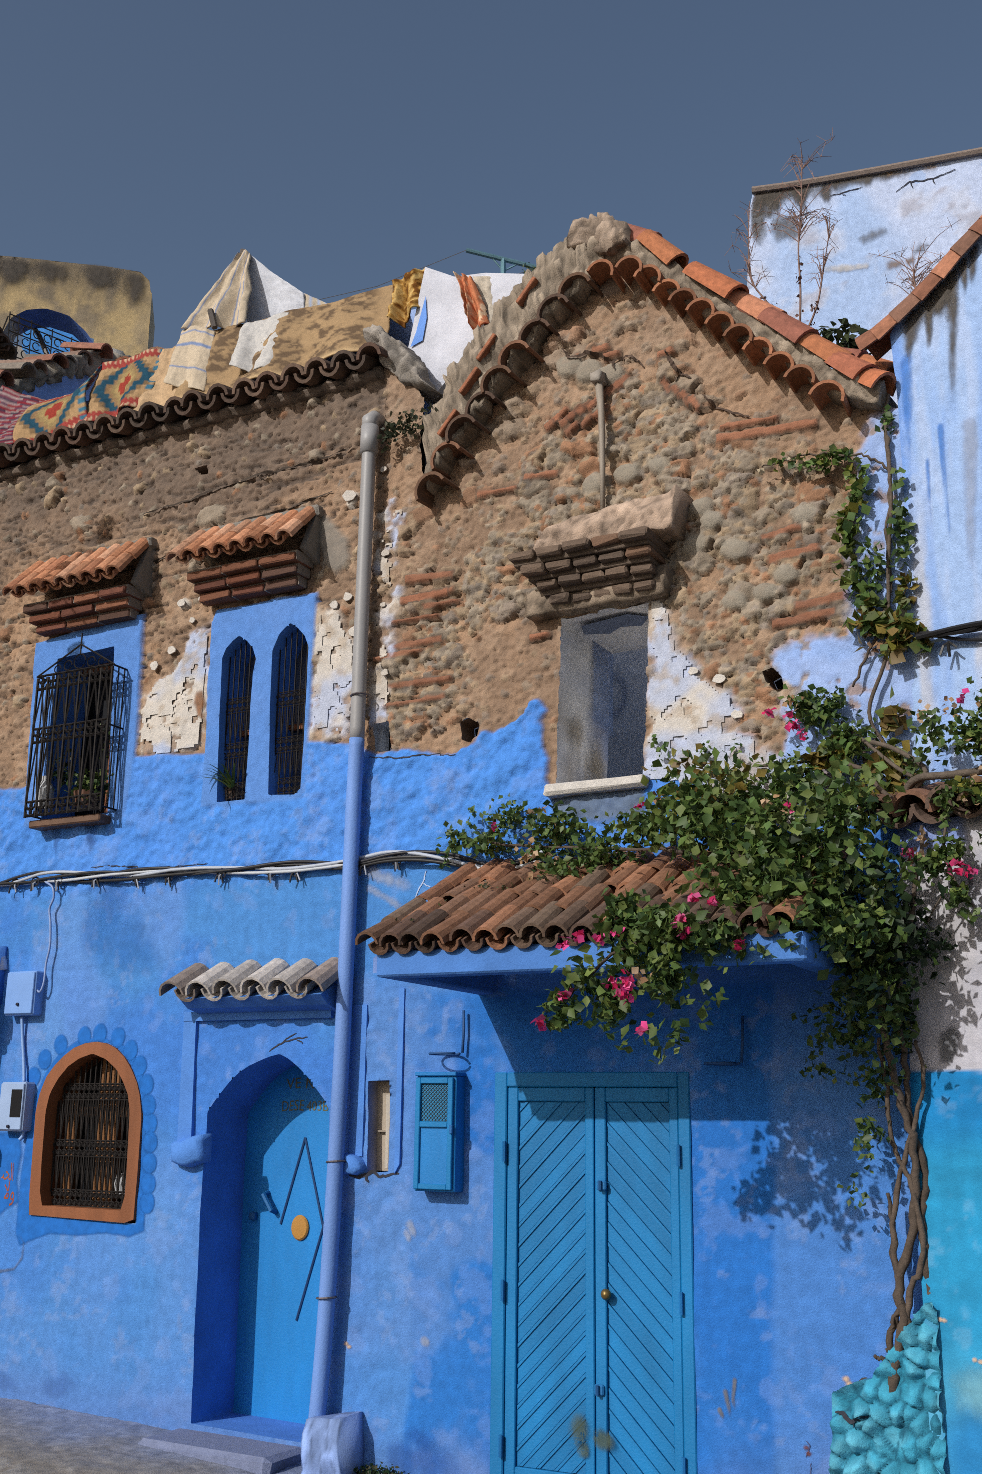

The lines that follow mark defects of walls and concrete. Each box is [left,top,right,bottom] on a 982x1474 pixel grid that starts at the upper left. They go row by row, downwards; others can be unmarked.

leakage [752,172,893,229]
leakage [903,246,978,420]
peeling [342,490,357,501]
peeling [377,509,402,607]
peeling [139,597,207,754]
peeling [313,592,354,731]
peeling [371,645,389,705]
peeling [552,596,797,822]